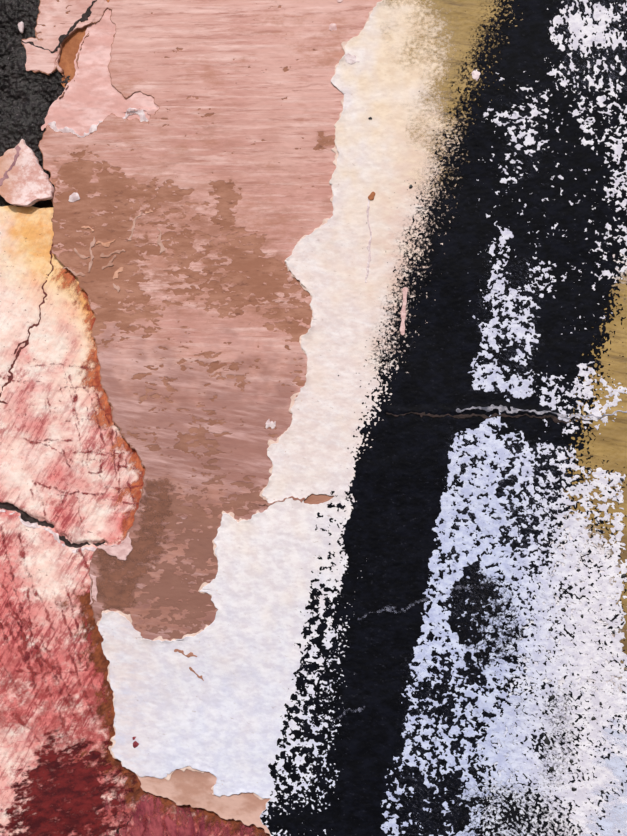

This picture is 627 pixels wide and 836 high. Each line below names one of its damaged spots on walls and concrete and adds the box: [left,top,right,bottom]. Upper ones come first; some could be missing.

crack [22,0,97,53]
crack [0,236,54,404]
flaking render [0,0,391,836]
crack [386,404,627,424]
crack [0,502,105,553]